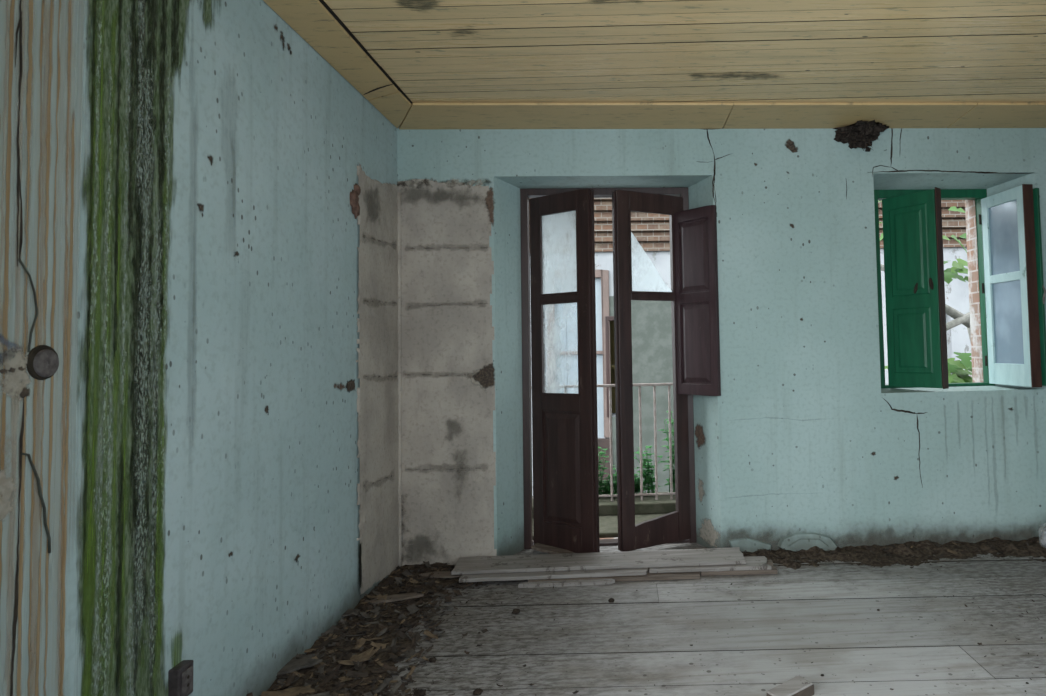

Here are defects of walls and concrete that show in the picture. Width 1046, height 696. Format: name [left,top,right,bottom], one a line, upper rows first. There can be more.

crack [696,128,733,214]
leakage [0,0,182,696]
crack [883,398,928,488]